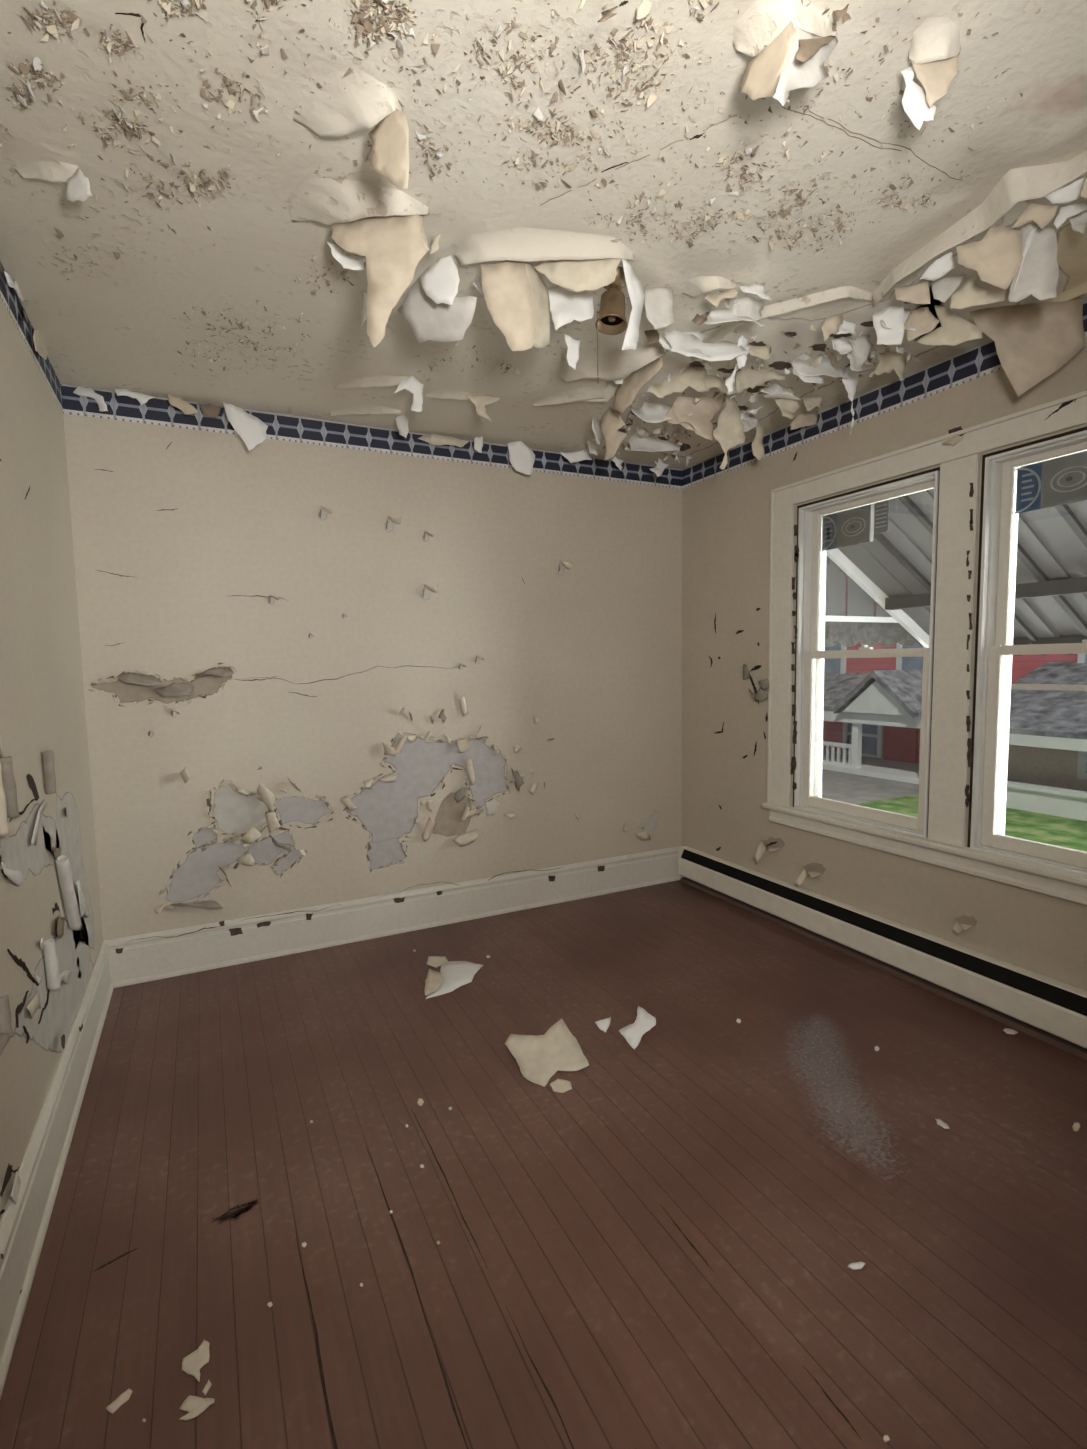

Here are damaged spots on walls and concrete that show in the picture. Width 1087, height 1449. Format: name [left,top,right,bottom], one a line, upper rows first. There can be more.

peeling [6,0,1087,477]
peeling [0,737,94,1057]
peeling [88,655,485,718]
peeling [155,695,546,936]